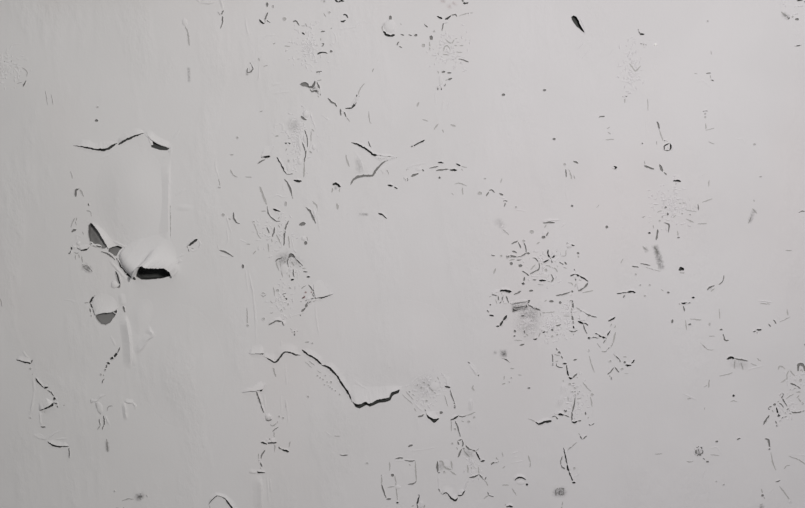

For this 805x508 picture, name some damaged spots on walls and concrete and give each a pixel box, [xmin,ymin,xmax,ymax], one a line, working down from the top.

peeling [421,12,473,111]
peeling [68,217,183,289]
peeling [298,201,320,231]
peeling [491,218,566,268]
peeling [576,307,599,340]
peeling [249,328,402,409]
peeling [602,346,635,380]
peeling [28,374,71,458]
peeling [243,382,289,437]
peeling [413,376,476,437]
crack [451,437,513,508]